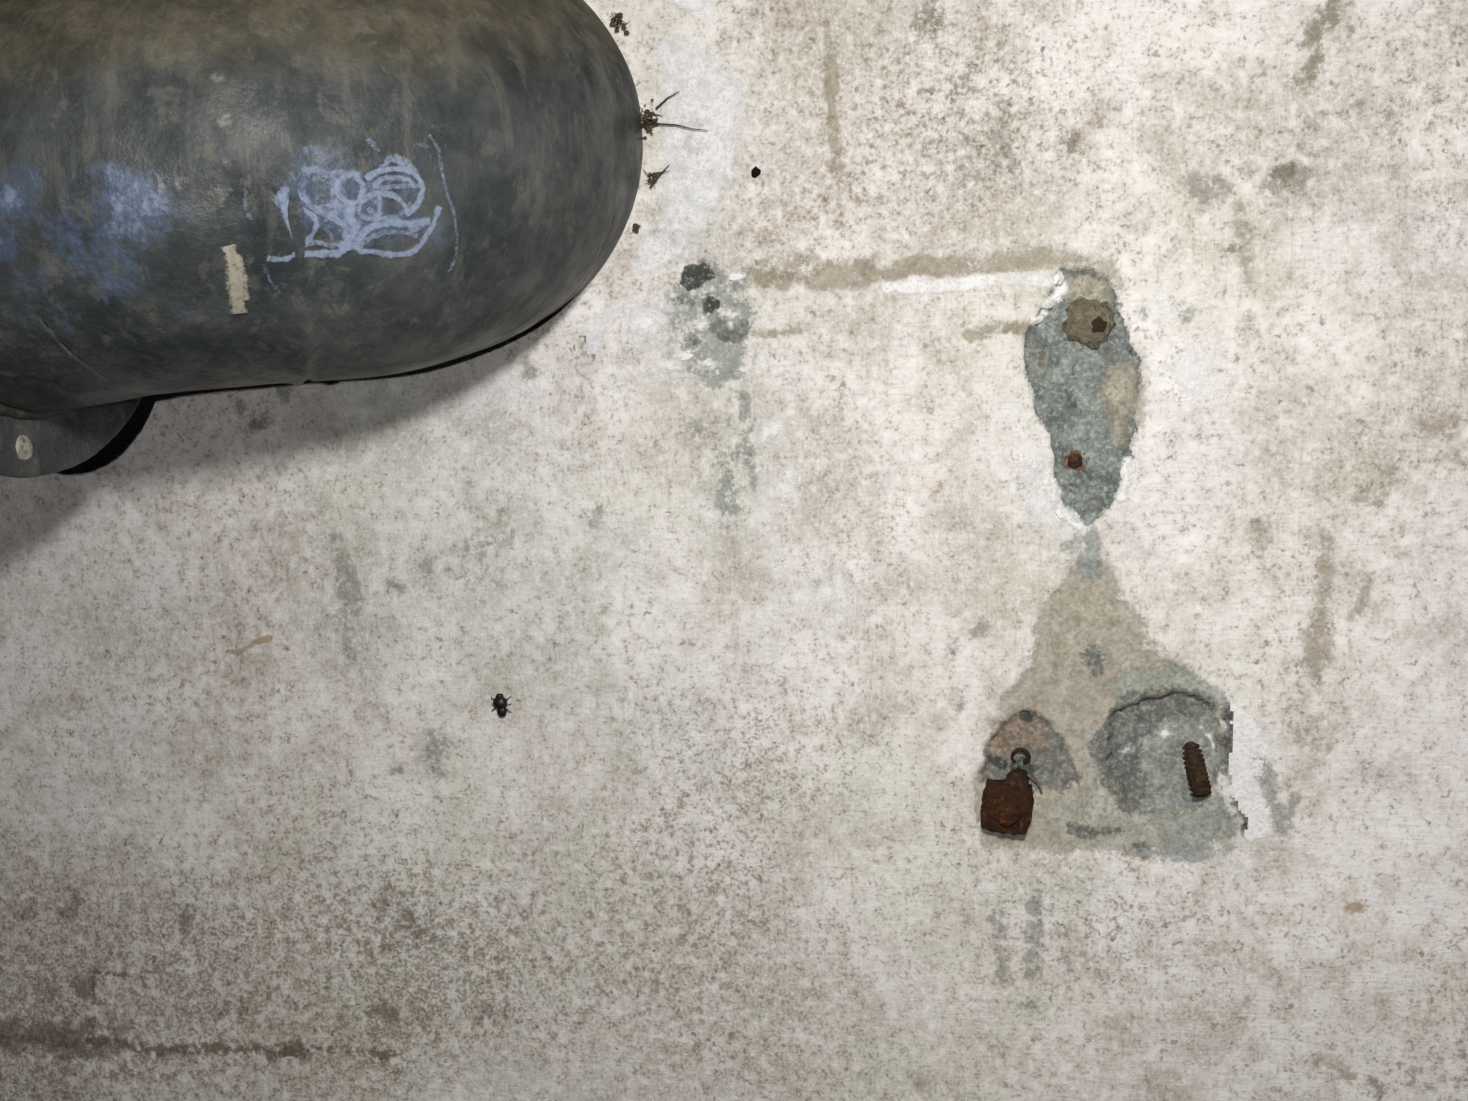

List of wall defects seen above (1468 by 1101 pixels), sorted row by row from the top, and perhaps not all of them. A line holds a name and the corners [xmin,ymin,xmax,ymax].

flaking render [1024,261,1144,581]
flaking render [982,710,1079,794]
flaking render [1089,688,1226,815]